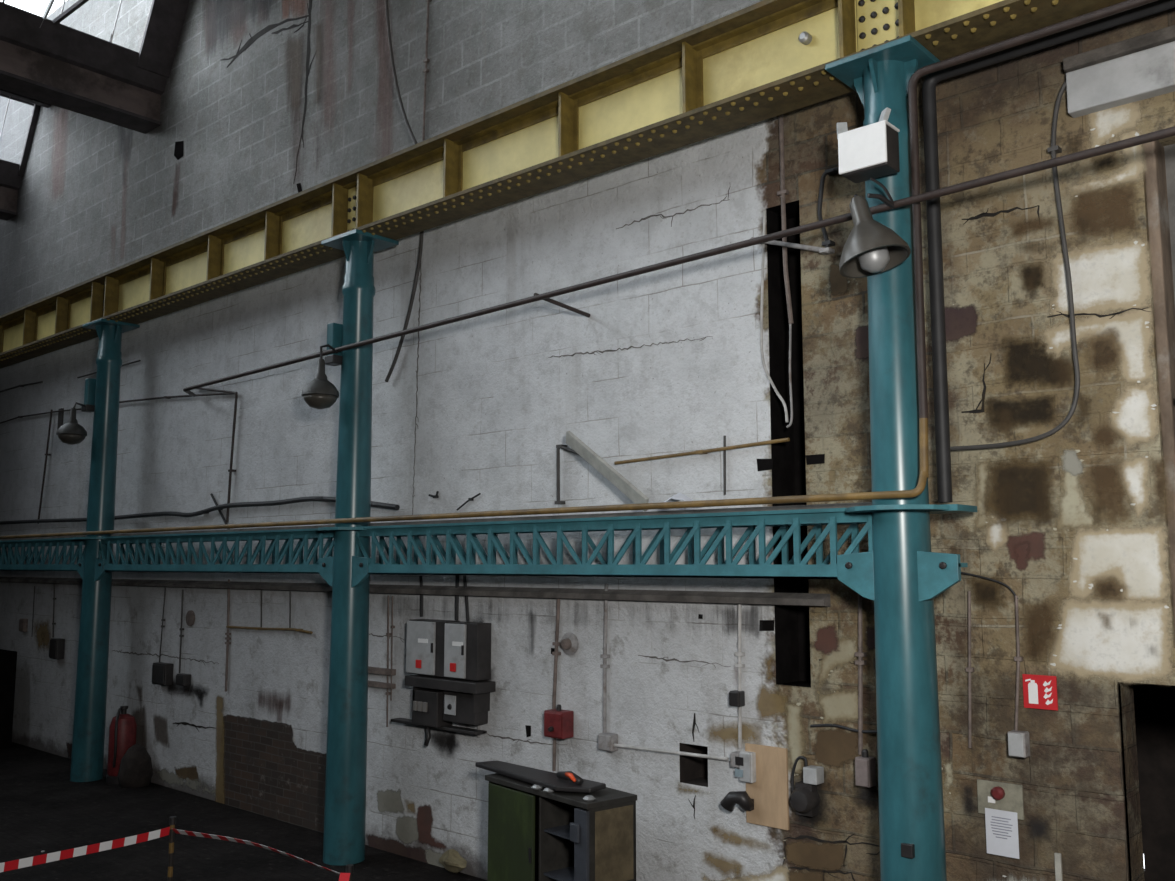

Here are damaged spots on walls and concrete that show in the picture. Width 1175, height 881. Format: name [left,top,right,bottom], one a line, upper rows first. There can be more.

crack [220,0,316,184]
crack [962,205,1040,225]
crack [549,336,713,358]
crack [961,354,991,413]
peeling [1040,238,1172,682]
leakage [985,460,1053,570]
leakage [1088,462,1129,519]
leakage [970,577,1003,608]
leakage [1094,578,1124,600]
flaking render [156,696,326,833]
peeling [366,789,467,873]
flaking render [703,840,844,881]